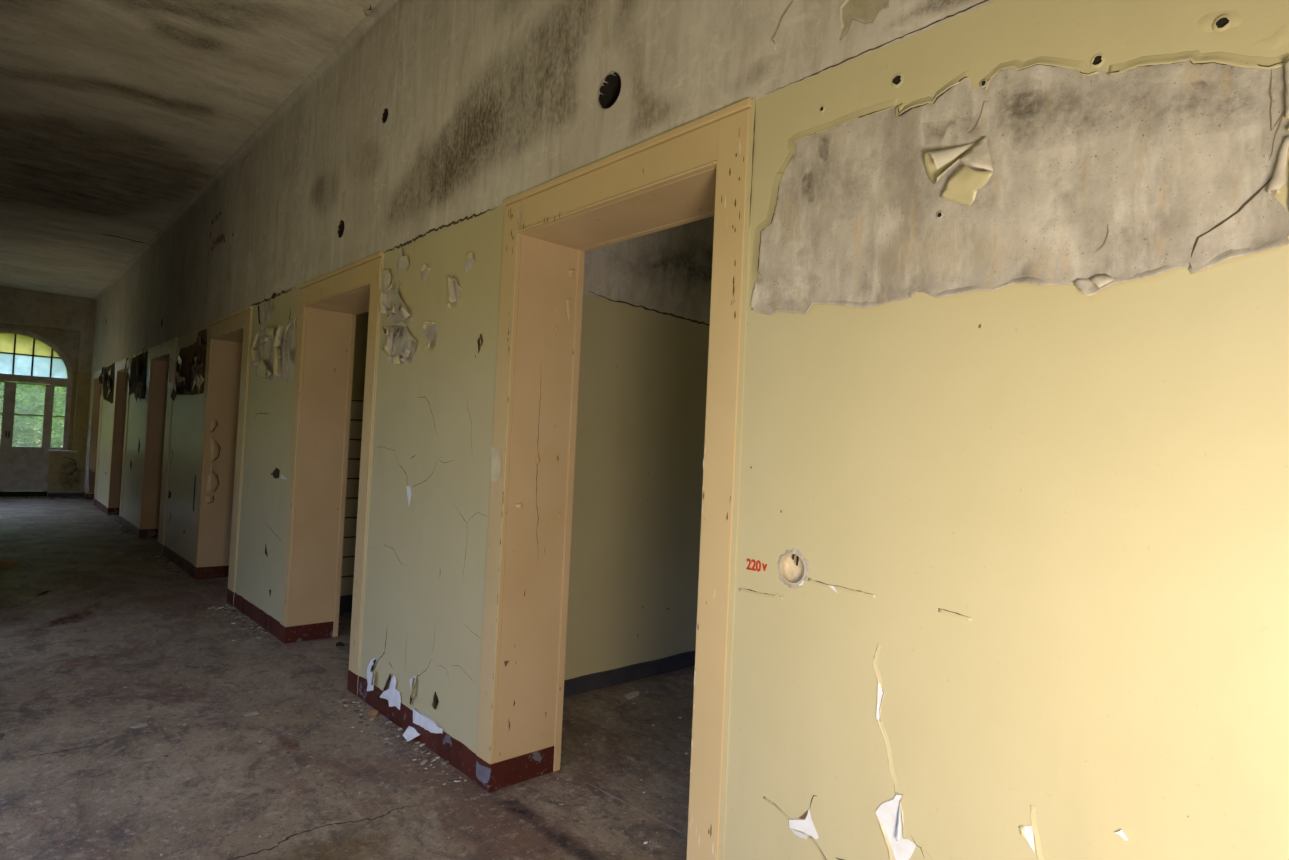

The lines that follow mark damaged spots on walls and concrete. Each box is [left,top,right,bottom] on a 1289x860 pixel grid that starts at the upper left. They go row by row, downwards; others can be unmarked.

peeling [839,0,889,41]
peeling [731,50,1289,318]
peeling [169,329,207,401]
peeling [250,293,297,381]
peeling [373,248,439,365]
crack [376,397,473,506]
peeling [367,626,443,734]
crack [873,643,929,860]
crack [228,802,429,860]
crack [763,795,844,860]
crack [1018,805,1044,860]